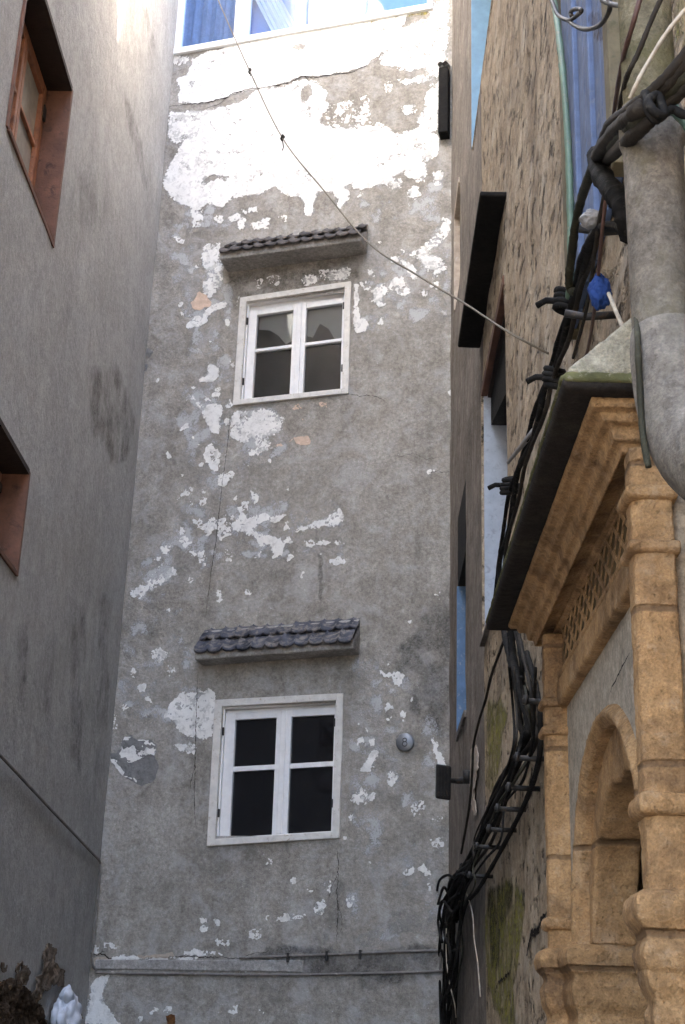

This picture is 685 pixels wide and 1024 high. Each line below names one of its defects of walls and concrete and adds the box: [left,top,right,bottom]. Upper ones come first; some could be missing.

crack [170,60,377,108]
peeling [162,0,450,230]
peeling [178,243,240,329]
peeling [180,361,311,487]
peeling [130,491,346,599]
flaking render [110,704,159,786]
peeling [164,688,216,755]
crack [190,678,198,822]
peeling [357,723,379,772]
crack [328,851,342,942]
peeling [81,918,230,1024]
leakage [485,881,524,1024]